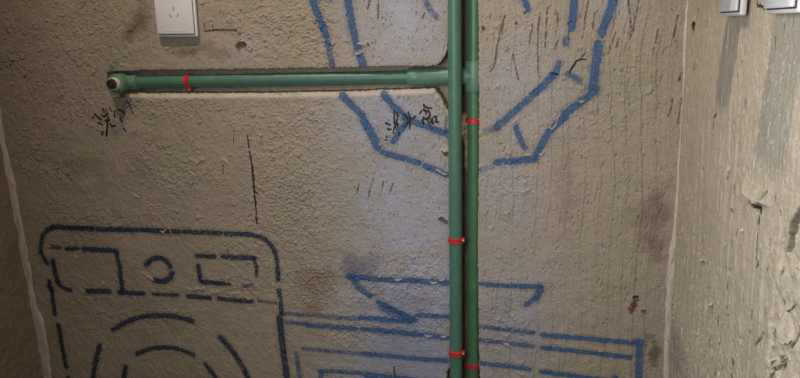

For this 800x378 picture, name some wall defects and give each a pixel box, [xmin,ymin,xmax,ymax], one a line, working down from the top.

hole [787,210,800,252]
flaking render [768,331,800,378]